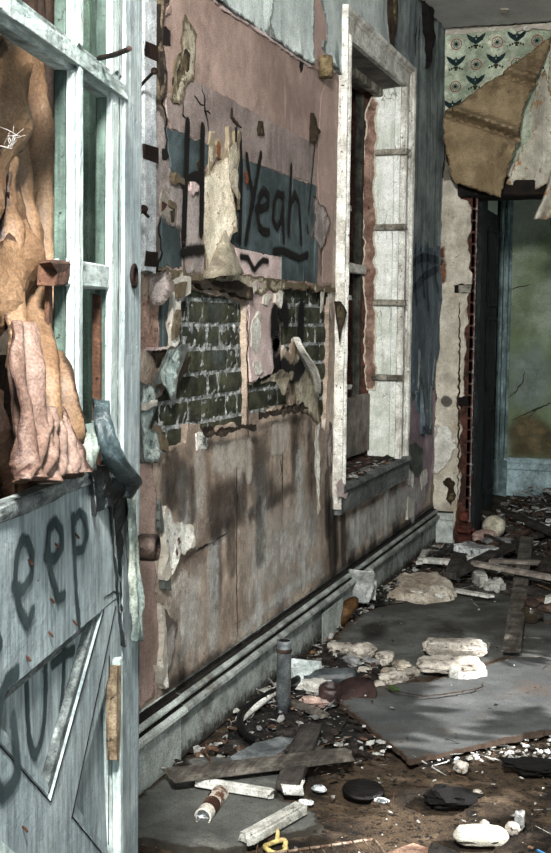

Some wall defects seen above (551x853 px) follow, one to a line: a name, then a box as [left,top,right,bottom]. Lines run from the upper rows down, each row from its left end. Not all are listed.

flaking render [156,0,197,104]
flaking render [159,190,177,227]
peeling [169,172,199,195]
peeling [196,108,249,210]
flaking render [454,283,473,293]
flaking render [139,276,327,463]
peeling [405,246,457,520]
peeling [156,499,196,591]
water stain [162,420,433,695]
peeling [153,603,178,689]